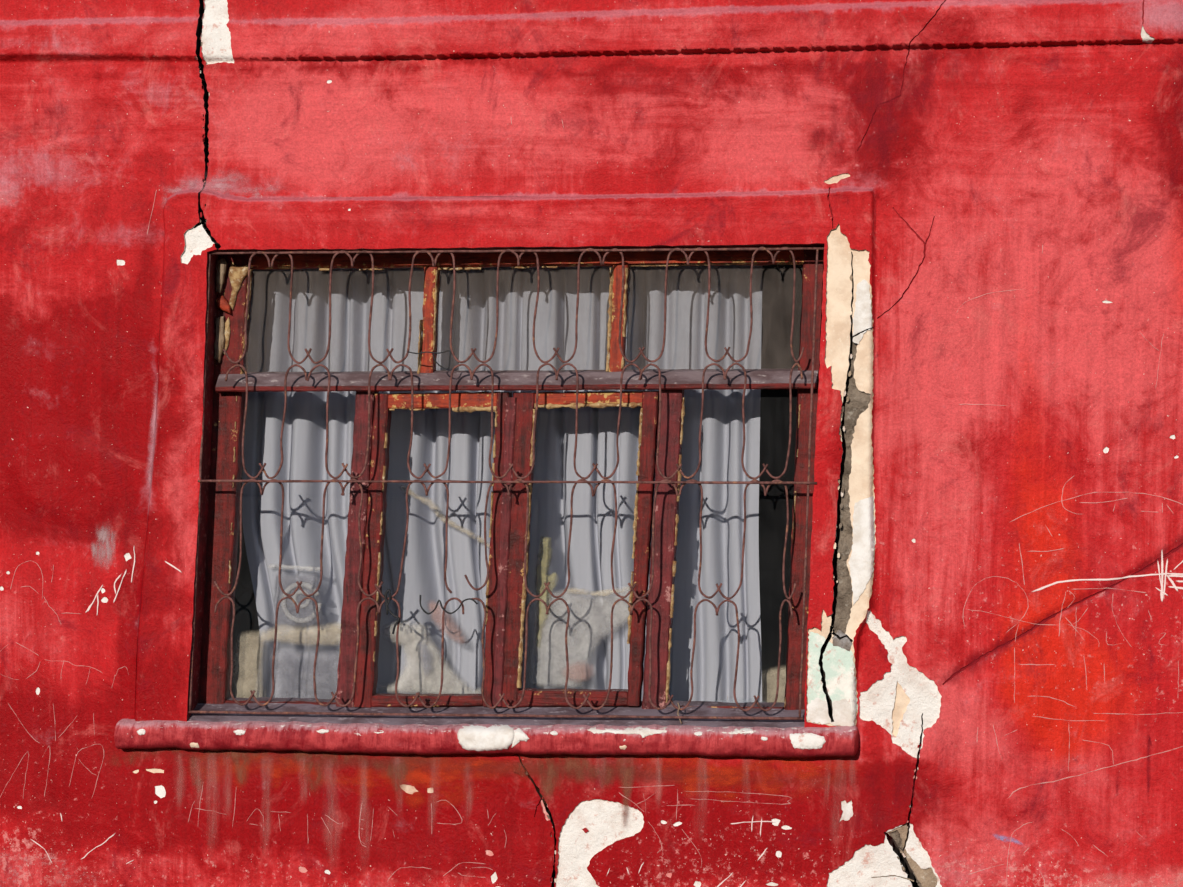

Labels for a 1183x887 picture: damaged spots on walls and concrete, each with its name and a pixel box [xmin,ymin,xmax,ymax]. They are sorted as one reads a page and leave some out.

flaking render [201,0,234,65]
crack [194,0,221,250]
flaking render [180,224,215,264]
crack [826,187,834,228]
crack [818,207,935,722]
peeling [848,496,875,605]
spalling [457,724,529,752]
flaking render [790,610,942,758]
crack [517,754,557,887]
flaking render [555,799,644,887]
flaking render [827,822,942,887]
crack [871,713,923,887]